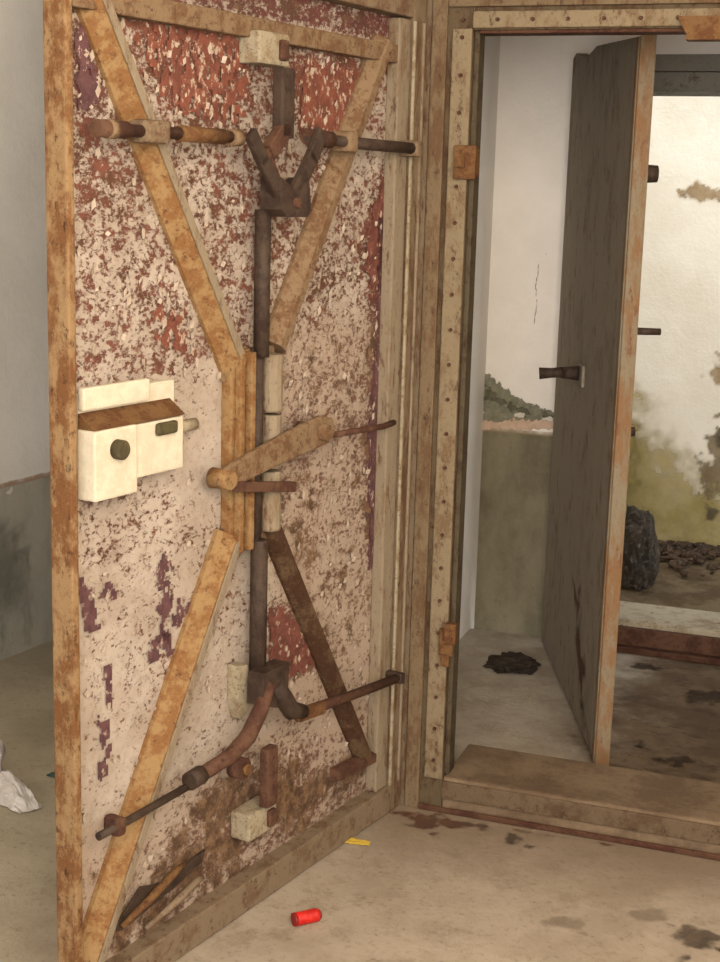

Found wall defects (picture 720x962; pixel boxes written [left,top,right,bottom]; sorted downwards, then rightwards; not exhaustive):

peeling [75,26,105,112]
peeling [120,18,256,133]
peeling [297,53,360,132]
peeling [199,198,229,238]
peeling [152,263,199,382]
peeling [289,348,321,415]
peeling [79,567,119,653]
peeling [84,663,117,785]